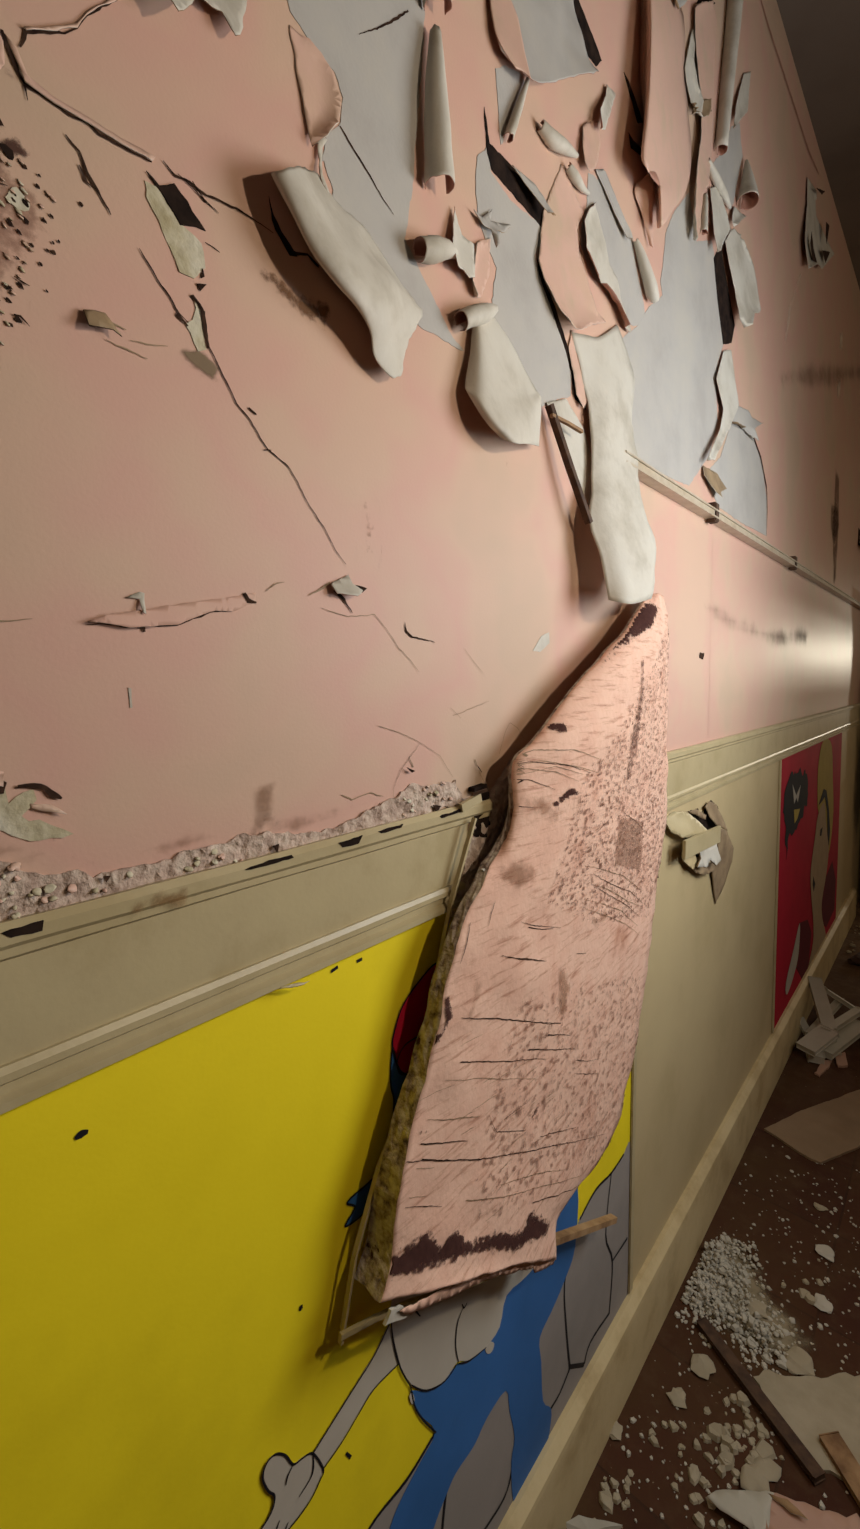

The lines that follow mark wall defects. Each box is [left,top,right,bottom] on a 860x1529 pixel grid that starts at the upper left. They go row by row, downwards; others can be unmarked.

spalling [0,119,60,346]
crack [0,0,319,268]
peeling [271,0,767,604]
peeling [805,177,834,269]
crack [106,248,346,564]
peeling [310,575,367,613]
spalling [0,760,512,938]
spalling [666,800,734,904]
peeling [383,1304,408,1326]